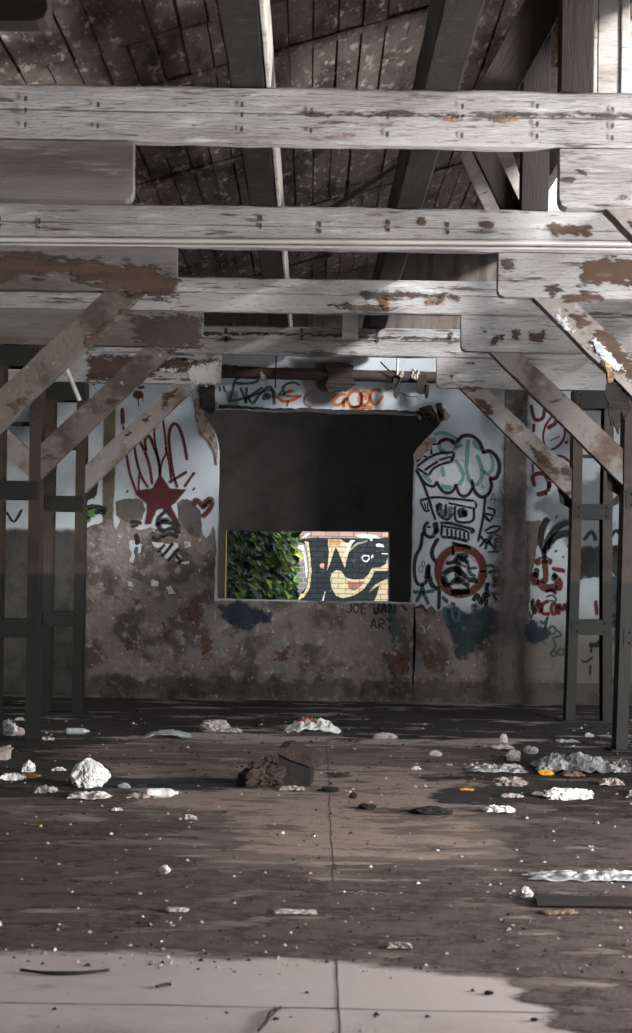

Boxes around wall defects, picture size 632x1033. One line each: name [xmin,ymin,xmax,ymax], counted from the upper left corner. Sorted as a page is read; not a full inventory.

peeling [304,111,632,124]
peeling [501,259,517,273]
peeling [545,255,632,383]
peeling [481,327,548,346]
flaking render [84,498,501,704]